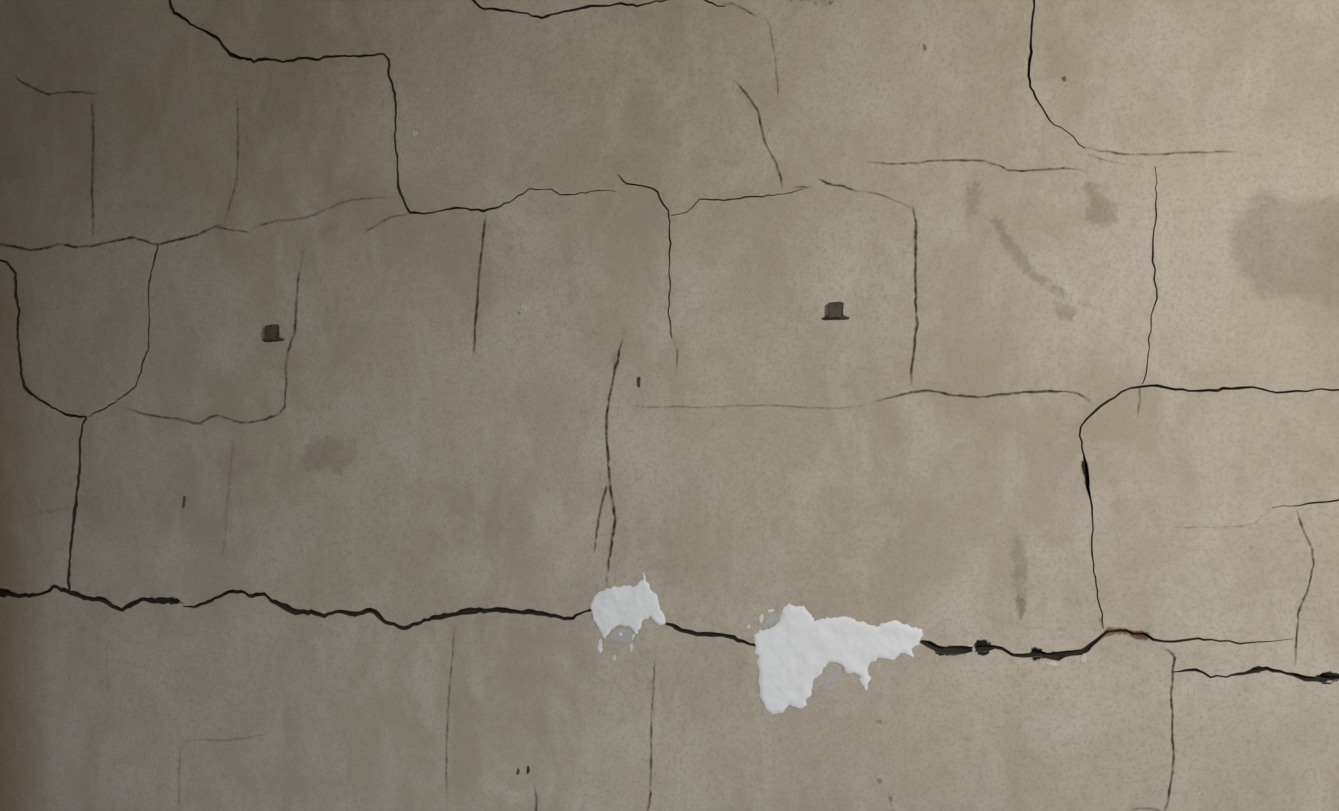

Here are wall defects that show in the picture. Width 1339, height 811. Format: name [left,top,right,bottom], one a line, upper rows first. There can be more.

crack [168,0,852,357]
crack [892,0,1124,172]
crack [0,207,592,630]
crack [596,349,620,567]
crack [665,622,755,646]
crack [899,152,1339,810]